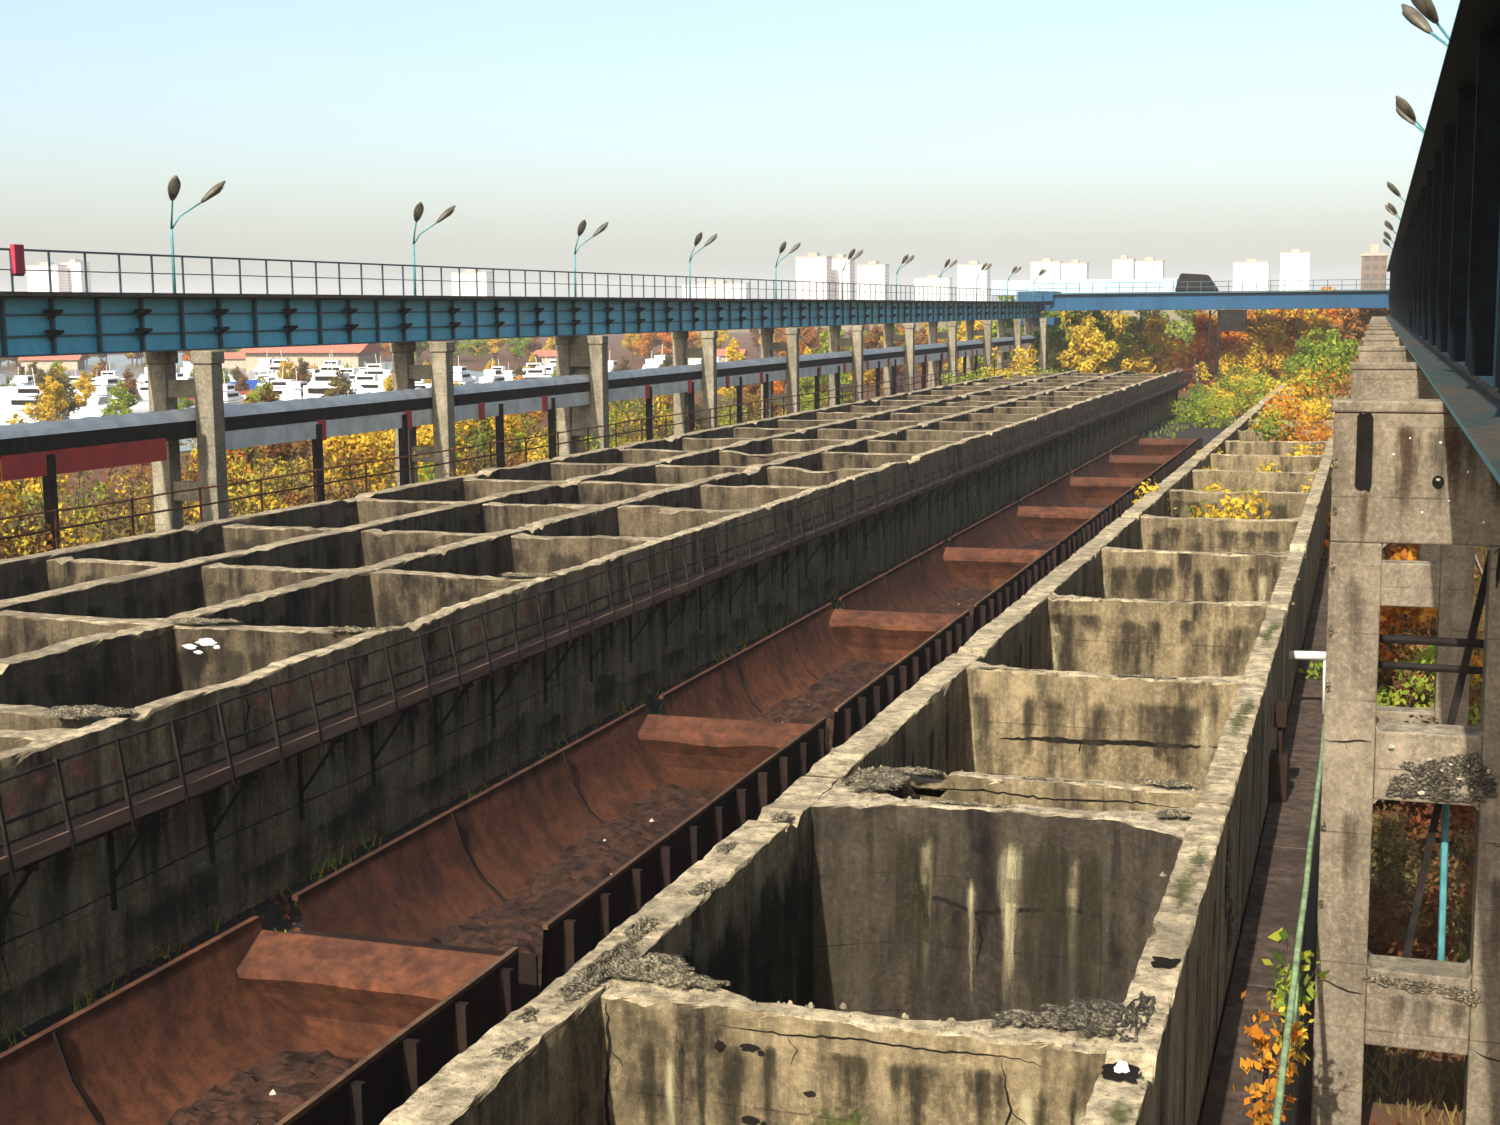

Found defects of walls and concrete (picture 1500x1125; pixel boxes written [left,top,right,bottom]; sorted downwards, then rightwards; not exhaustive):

spalling [838,765,1113,813]
crack [1000,736,1217,754]
spalling [1386,744,1498,804]
damp [895,835,937,1015]
damp [1003,846,1103,1004]
spalling [488,915,815,1060]
spalling [937,991,1157,1047]